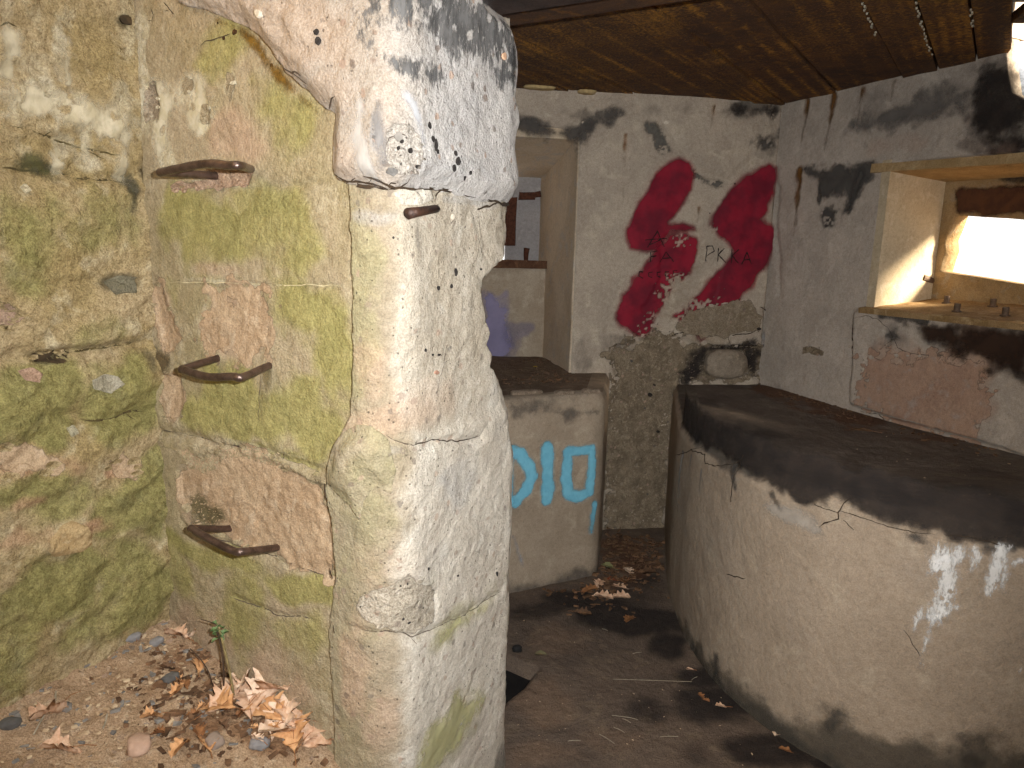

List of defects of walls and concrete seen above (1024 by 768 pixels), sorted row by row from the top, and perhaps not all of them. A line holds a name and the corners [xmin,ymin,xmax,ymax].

damp [384,54,443,121]
damp [358,0,517,93]
damp [354,103,388,175]
damp [804,161,875,227]
spalling [600,299,764,530]
peeling [852,346,998,445]
crack [814,497,1002,546]
damp [914,543,1024,629]